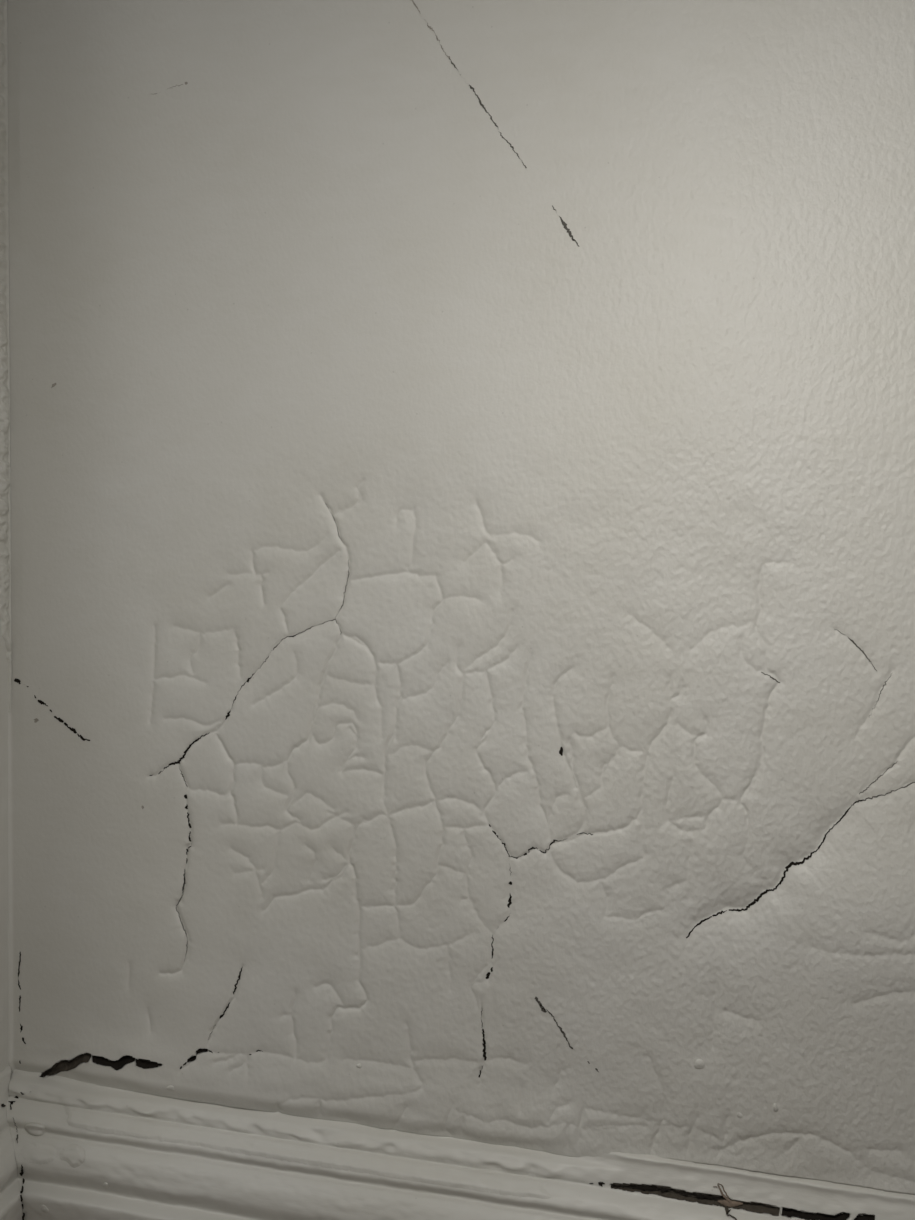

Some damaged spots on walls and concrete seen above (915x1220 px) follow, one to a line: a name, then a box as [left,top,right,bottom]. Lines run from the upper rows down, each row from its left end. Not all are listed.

crack [412,0,527,168]
crack [552,205,579,246]
crack [14,679,90,741]
crack [149,500,349,961]
crack [836,629,892,716]
crack [486,824,593,979]
crack [686,762,915,938]
crack [1,952,242,1220]
crack [478,1011,487,1078]
crack [589,1182,875,1220]